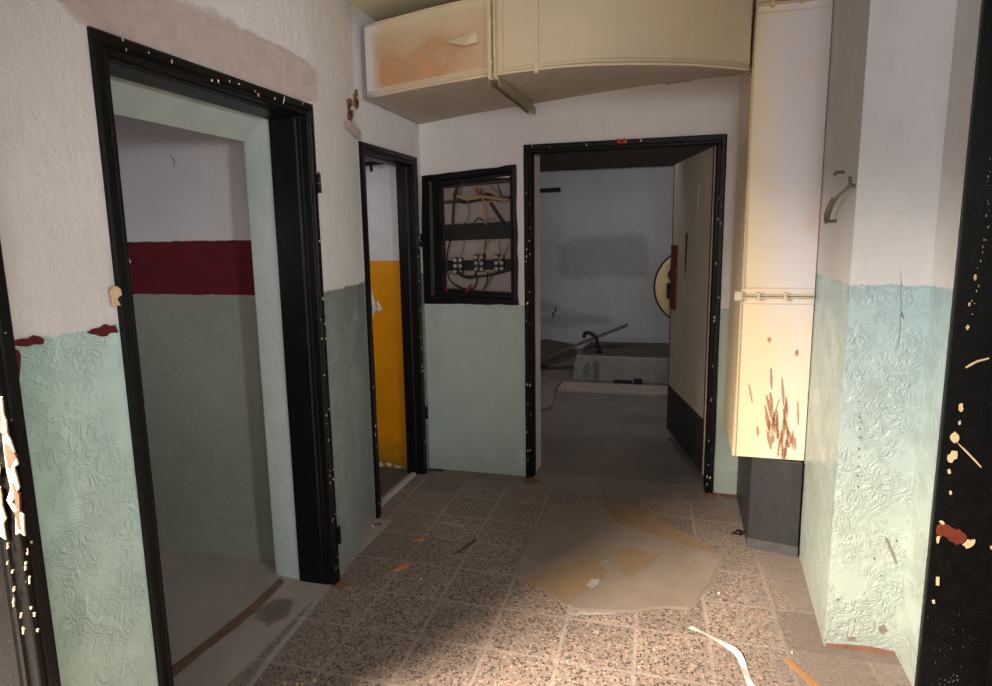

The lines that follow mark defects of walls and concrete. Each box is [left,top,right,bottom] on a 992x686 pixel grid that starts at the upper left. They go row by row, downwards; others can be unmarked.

crack [895,275,903,347]
rust [757,370,809,460]
peeling [0,396,33,584]
peeling [936,520,975,549]
peeling [12,586,39,634]